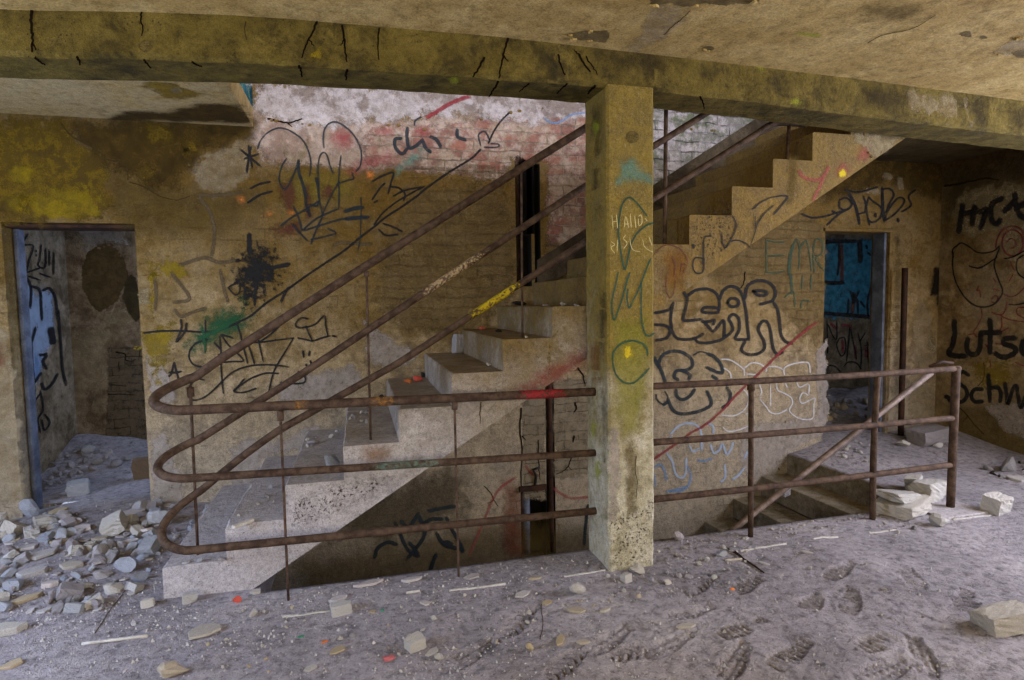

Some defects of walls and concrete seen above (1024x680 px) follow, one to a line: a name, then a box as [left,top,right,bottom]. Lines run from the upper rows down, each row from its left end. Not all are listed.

crack [29,10,46,65]
crack [140,12,152,68]
crack [298,21,349,80]
crack [472,38,530,97]
crack [557,49,598,94]
damp [71,82,256,190]
spalling [249,84,586,333]
spalling [79,231,187,502]